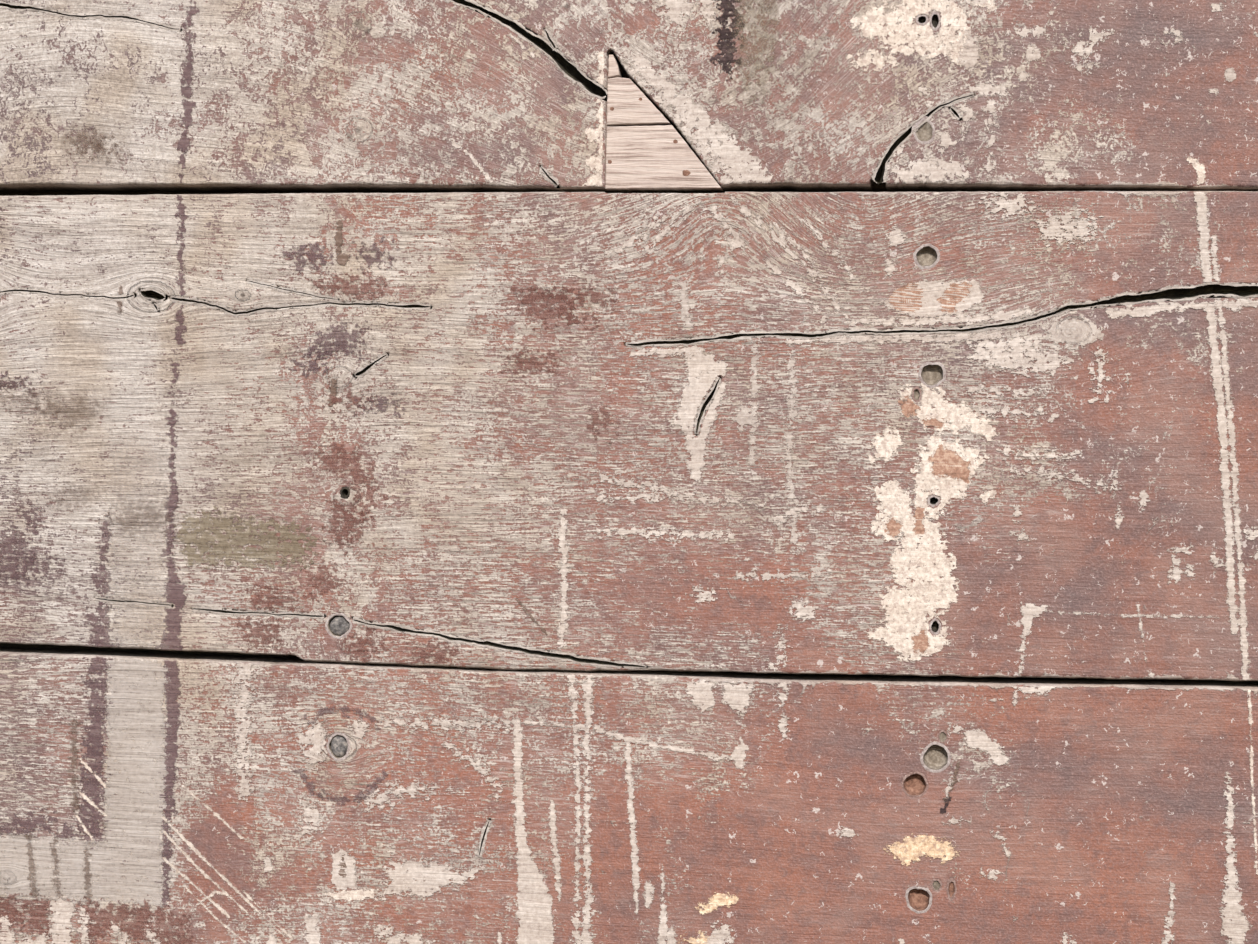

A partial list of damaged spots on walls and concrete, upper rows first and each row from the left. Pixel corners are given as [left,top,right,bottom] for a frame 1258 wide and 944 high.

crack [0,0,181,32]
crack [444,0,608,100]
peeling [845,0,1115,184]
crack [871,92,975,184]
crack [0,286,135,301]
crack [170,277,431,317]
crack [625,281,1258,349]
crack [693,377,721,434]
peeling [582,44,1258,874]
crack [95,596,647,670]
peeling [979,867,1003,881]
peeling [1219,771,1253,944]